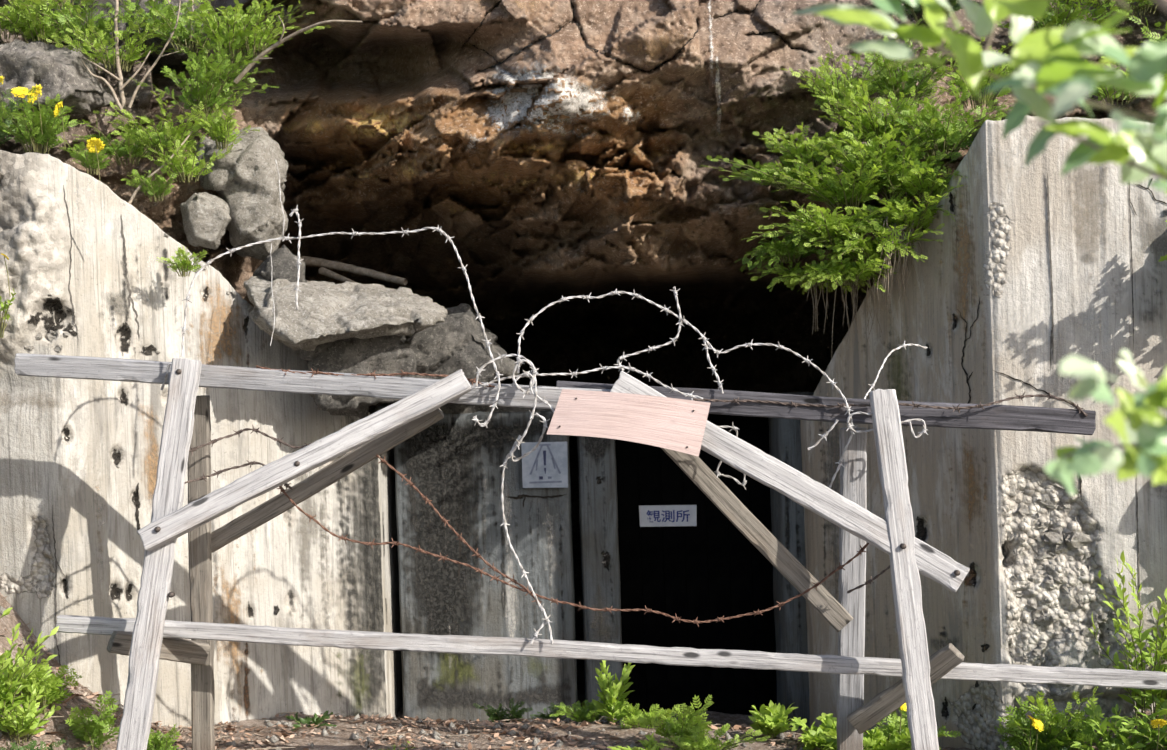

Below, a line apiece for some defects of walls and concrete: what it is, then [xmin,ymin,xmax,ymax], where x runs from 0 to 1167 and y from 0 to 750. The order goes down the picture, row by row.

spalling [24,294,77,351]
rust [200,288,249,365]
crack [957,173,1085,410]
spalling [0,515,69,599]
damp [287,455,387,632]
damp [400,417,552,636]
spalling [1000,466,1130,668]
damp [350,649,386,711]
damp [417,652,571,709]
spalling [1023,683,1070,696]